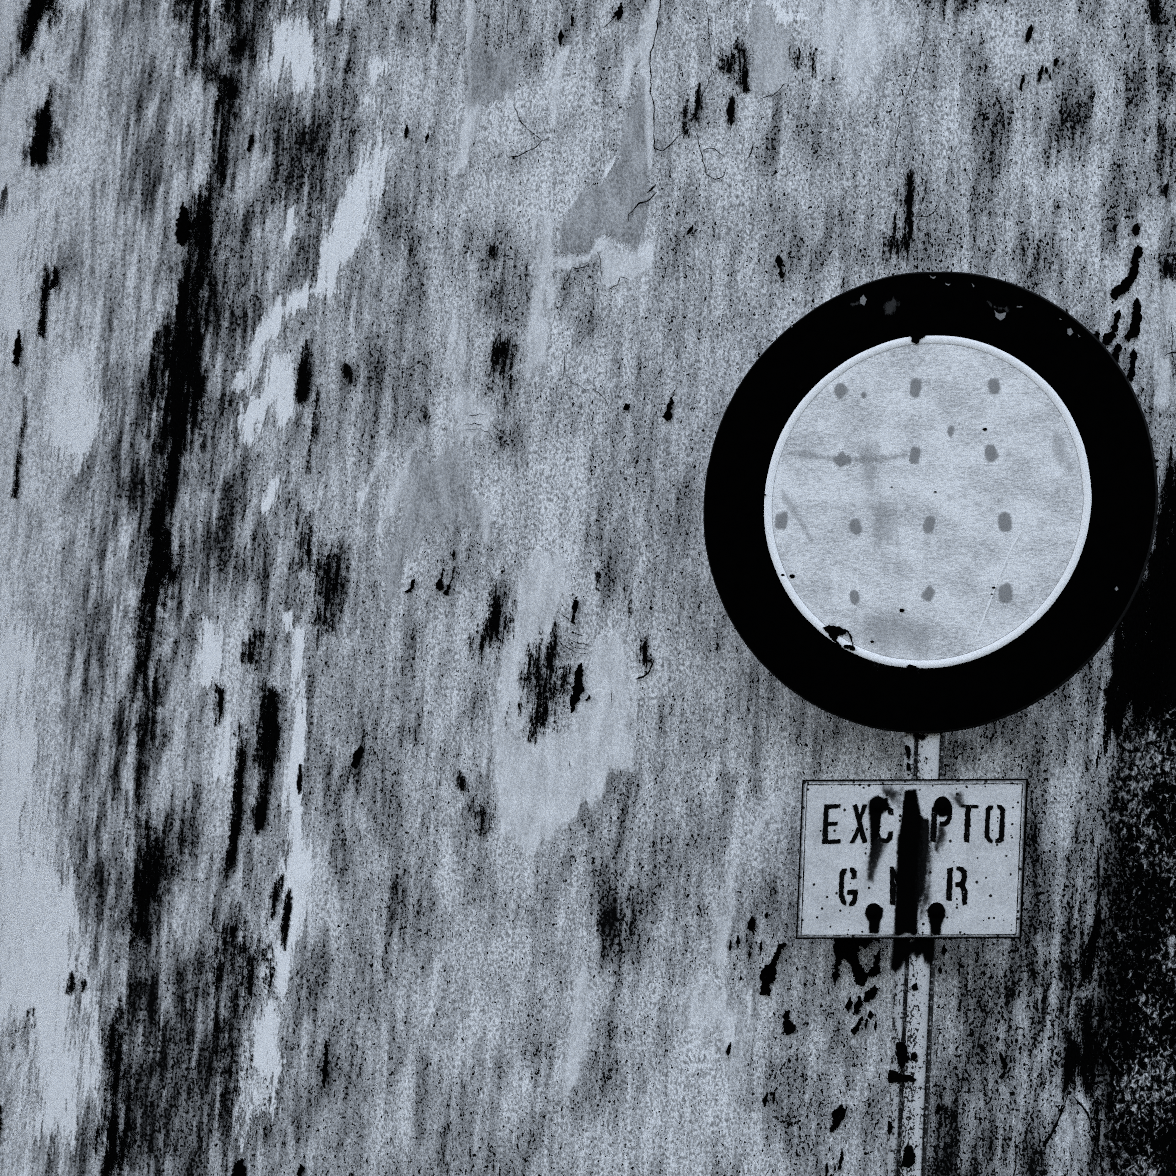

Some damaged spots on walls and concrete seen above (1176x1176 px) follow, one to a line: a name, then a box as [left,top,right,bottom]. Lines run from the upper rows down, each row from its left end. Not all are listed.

water stain [1144,0,1162,25]
water stain [231,49,402,476]
flaking render [521,0,664,383]
flaking render [1094,223,1176,410]
water stain [1153,255,1176,288]
water stain [0,0,351,1176]
water stain [1101,446,1176,763]
spalling [825,1104,848,1176]
peeling [828,939,881,1036]
water stain [1060,891,1117,1176]